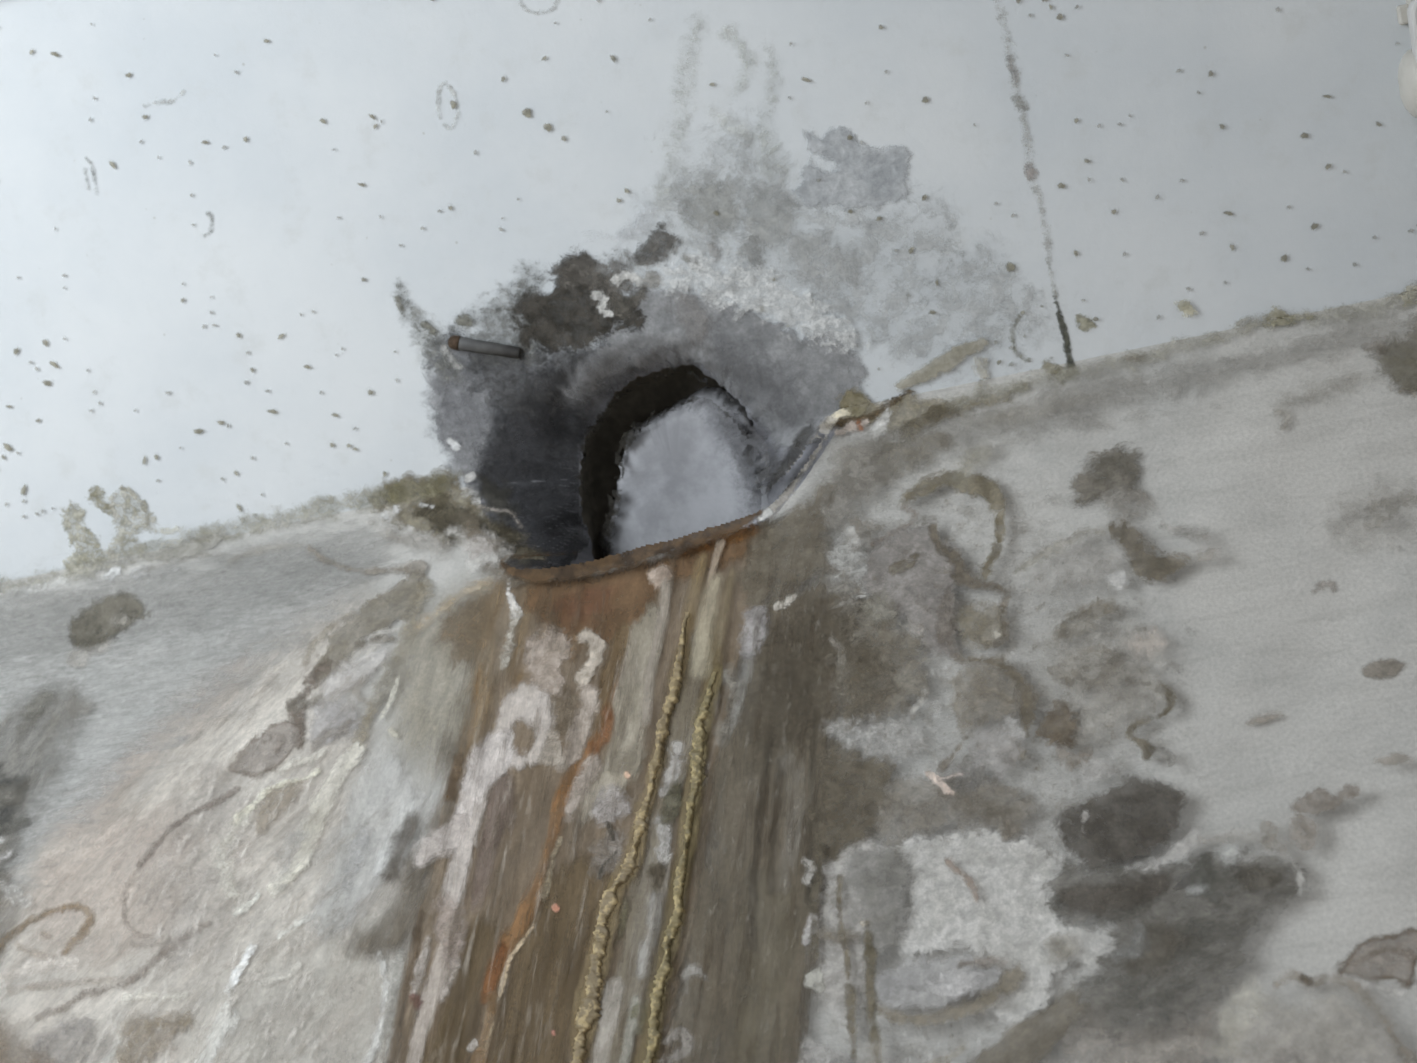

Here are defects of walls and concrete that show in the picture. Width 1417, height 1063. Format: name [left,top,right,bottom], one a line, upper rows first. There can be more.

peeling [522,108,566,141]
crack [1000,15,1051,248]
crack [1011,291,1096,384]
spalling [570,357,838,565]
damp [394,131,1417,1063]
damp [0,527,673,1063]
rust [353,504,770,1063]